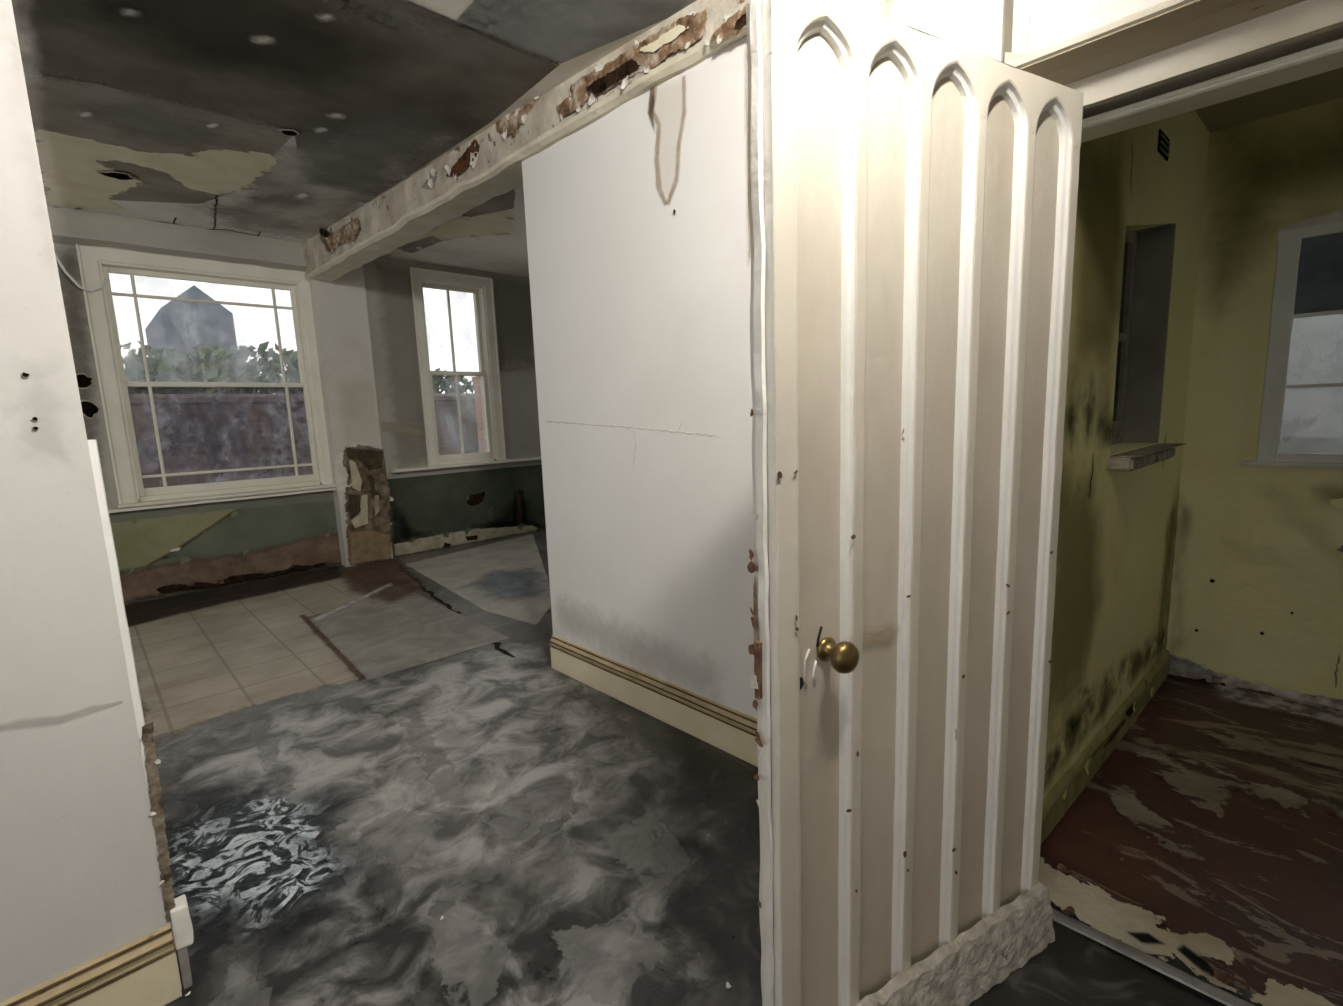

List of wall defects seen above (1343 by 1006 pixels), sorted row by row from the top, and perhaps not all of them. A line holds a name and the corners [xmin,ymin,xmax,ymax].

peeling [557,3,749,119]
peeling [34,129,277,210]
peeling [422,139,480,190]
peeling [496,95,540,140]
flaking render [319,216,359,257]
peeling [378,189,516,258]
flaking render [111,442,537,602]
leakage [1049,479,1095,700]
leakage [1047,679,1113,782]
peeling [1044,652,1343,861]
peeling [1038,857,1335,1006]